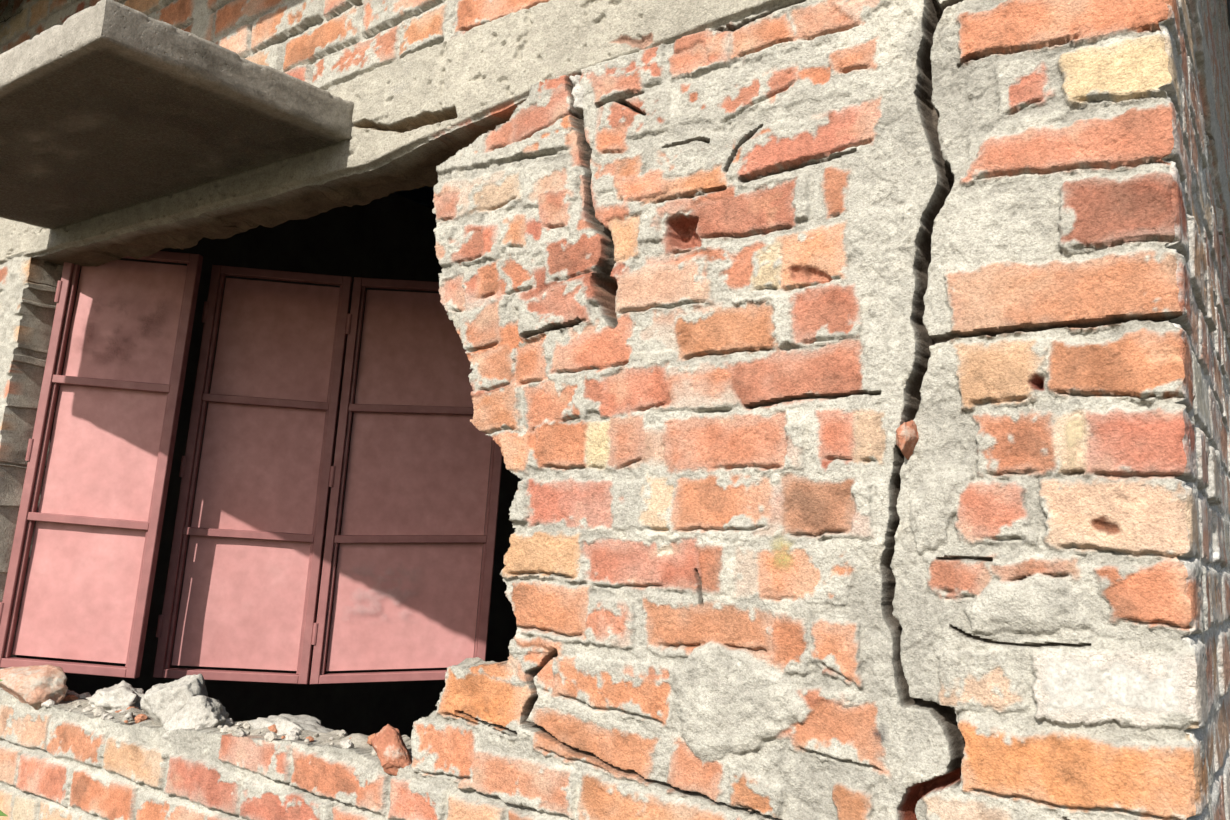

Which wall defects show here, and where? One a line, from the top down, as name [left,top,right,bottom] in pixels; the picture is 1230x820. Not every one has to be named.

crack [711,0,807,32]
crack [564,69,646,280]
crack [654,124,857,205]
crack [519,313,618,340]
crack [744,0,1182,820]
crack [692,568,704,607]
spalling [371,724,412,776]
crack [454,649,783,820]